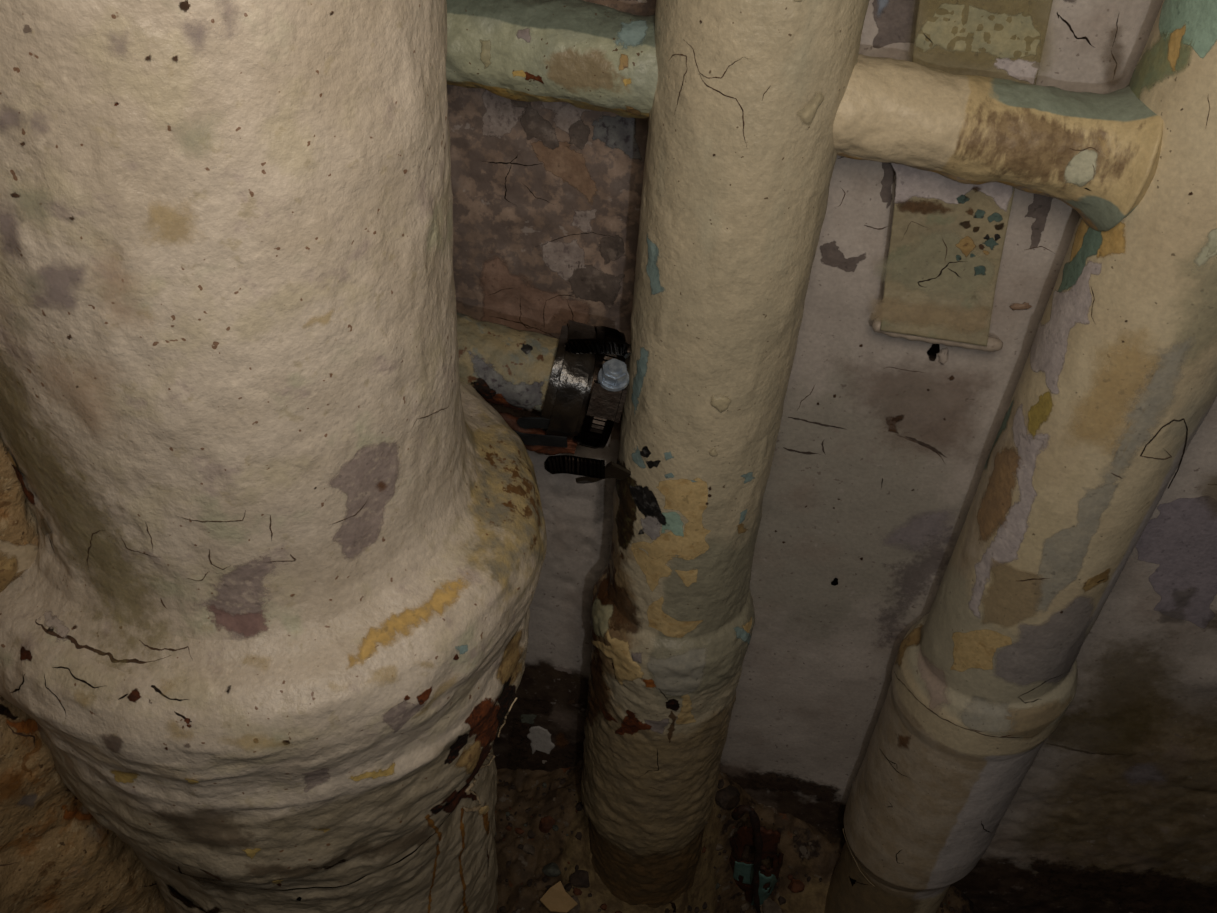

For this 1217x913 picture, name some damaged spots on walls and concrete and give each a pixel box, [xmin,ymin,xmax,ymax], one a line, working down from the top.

crack [670,39,769,145]
flaking render [480,90,642,335]
peeling [1064,142,1107,191]
peeling [591,478,712,734]
peeling [1083,569,1110,591]
peeling [1136,496,1217,628]
crack [10,619,192,722]
rust [462,741,492,789]
leakage [1030,857,1217,913]